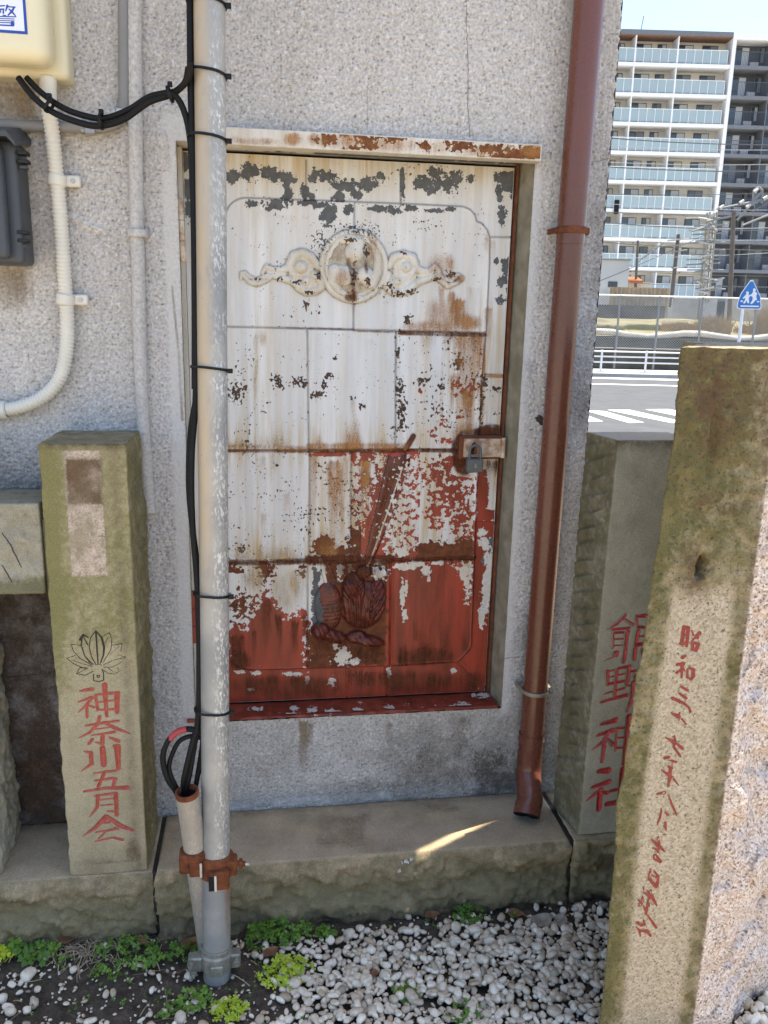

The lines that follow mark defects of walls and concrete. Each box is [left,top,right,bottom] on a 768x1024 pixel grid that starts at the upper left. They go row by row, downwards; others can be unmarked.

corrosion [482,145,541,160]
corrosion [277,261,503,508]
peeling [226,133,540,714]
corrosion [229,543,476,591]
corrosion [231,636,248,668]
corrosion [355,648,451,690]